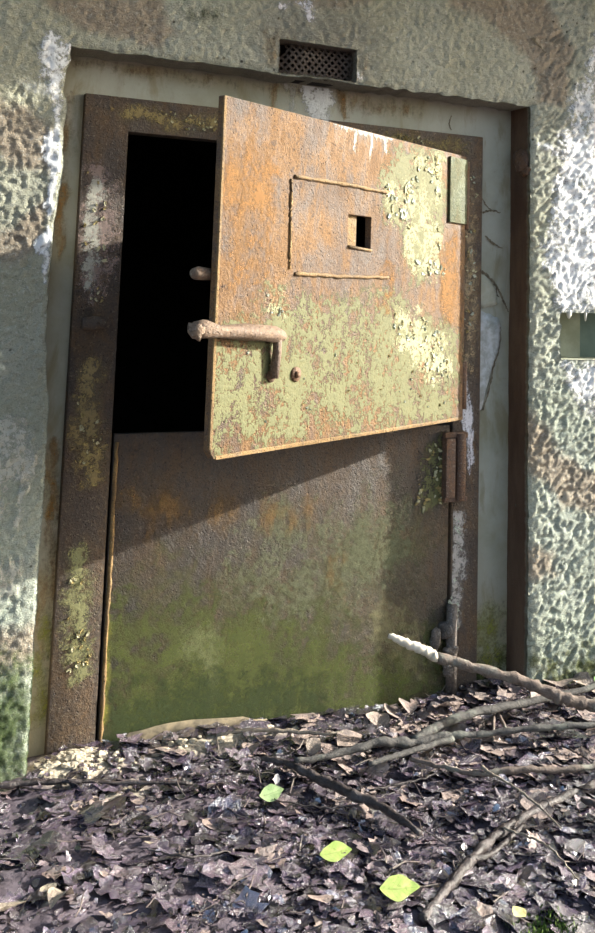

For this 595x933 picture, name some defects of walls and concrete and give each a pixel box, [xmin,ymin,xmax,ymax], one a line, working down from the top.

water stain [22,31,71,283]
corrosion [223,142,280,288]
peeling [211,128,502,458]
corrosion [437,230,464,323]
peeling [414,431,467,630]